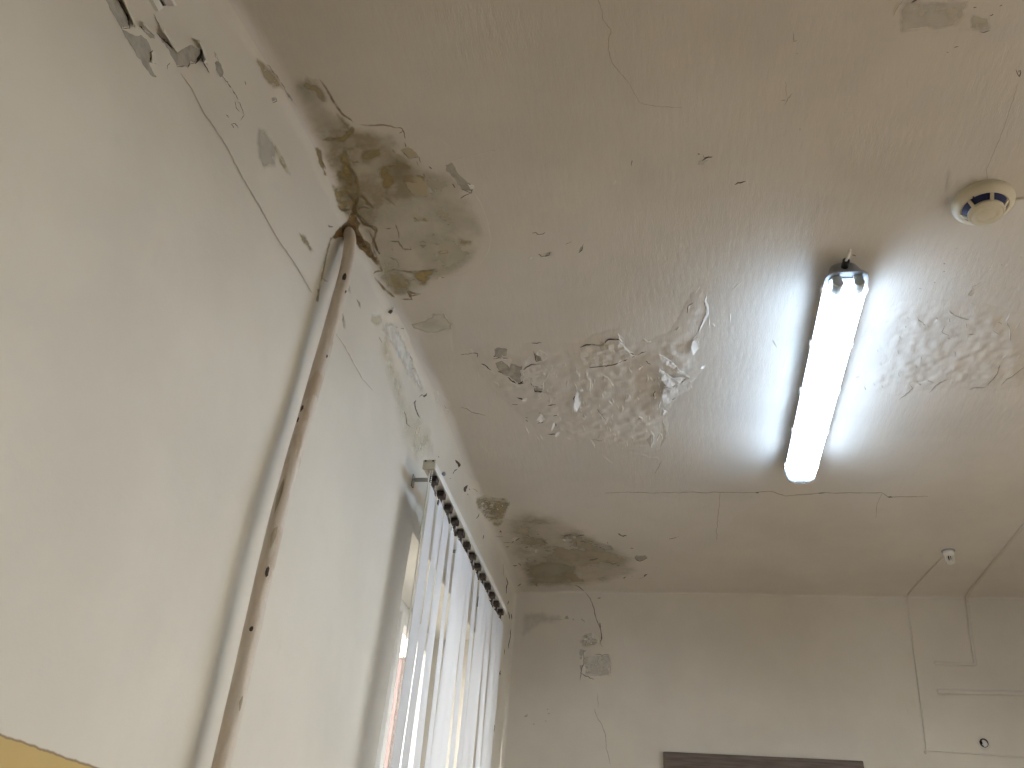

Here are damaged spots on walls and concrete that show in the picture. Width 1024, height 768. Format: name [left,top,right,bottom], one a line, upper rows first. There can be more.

peeling [106,0,210,77]
crack [180,53,312,293]
damp [305,84,373,218]
damp [372,226,432,300]
peeling [462,291,706,452]
crack [591,421,928,540]